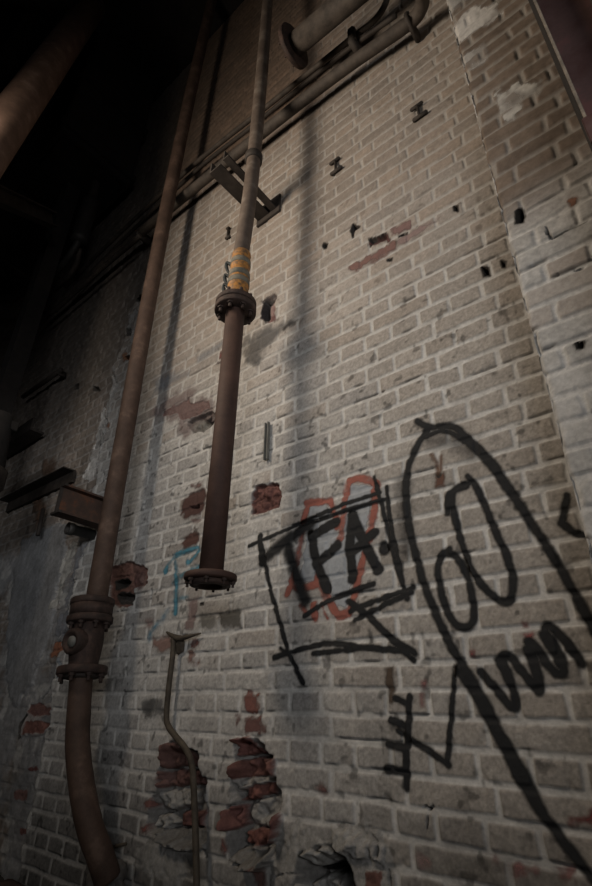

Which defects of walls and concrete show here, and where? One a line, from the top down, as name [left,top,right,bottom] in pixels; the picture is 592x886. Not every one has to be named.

peeling [348,220,431,271]
spalling [162,397,215,434]
spalling [251,482,282,516]
spalling [109,560,148,609]
spalling [141,690,395,886]